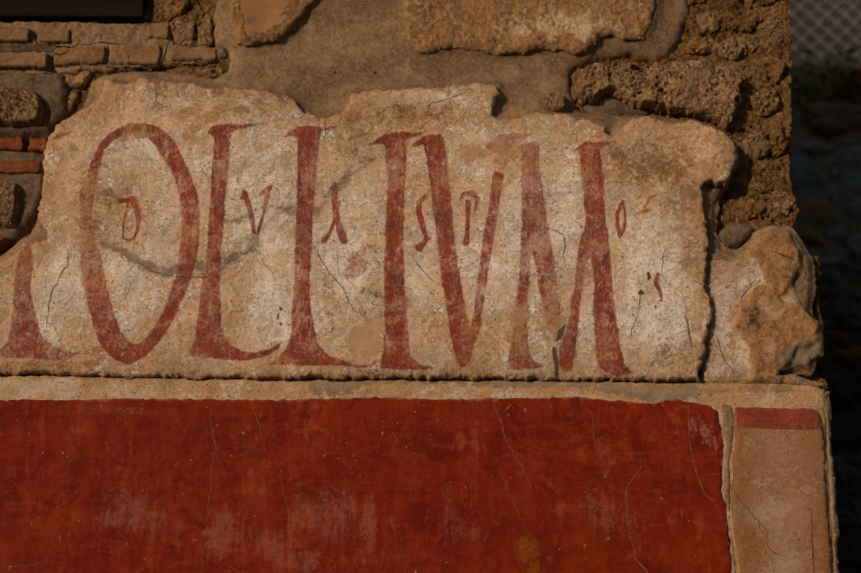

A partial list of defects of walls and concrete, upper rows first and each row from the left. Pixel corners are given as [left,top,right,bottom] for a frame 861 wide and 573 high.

crack [46,249,75,326]
spalling [780,341,824,371]
crack [492,400,540,558]
crack [580,400,648,573]